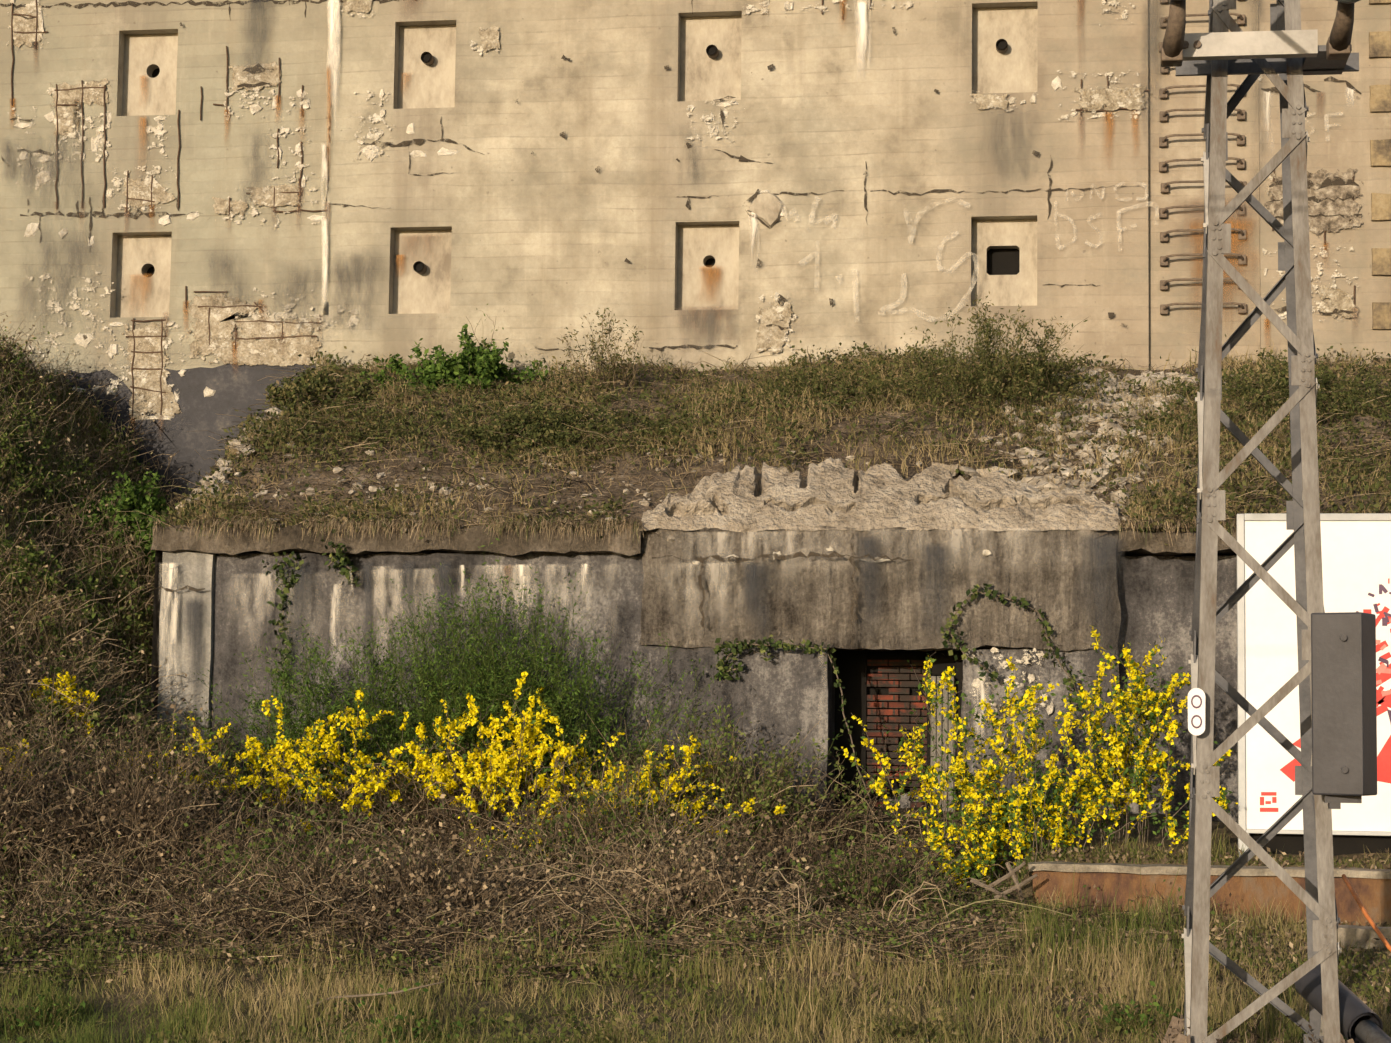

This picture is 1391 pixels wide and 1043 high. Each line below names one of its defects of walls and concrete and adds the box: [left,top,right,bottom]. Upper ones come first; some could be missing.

crack [0,0,417,20]
spalling [1,0,180,218]
spalling [200,46,329,227]
crack [326,71,388,217]
rust [1223,201,1244,271]
spalling [1307,168,1363,322]
peeling [26,270,360,517]
spalling [639,457,1121,571]
water stain [162,563,200,672]
water stain [350,563,413,626]
water stain [438,563,464,632]
water stain [493,565,530,595]